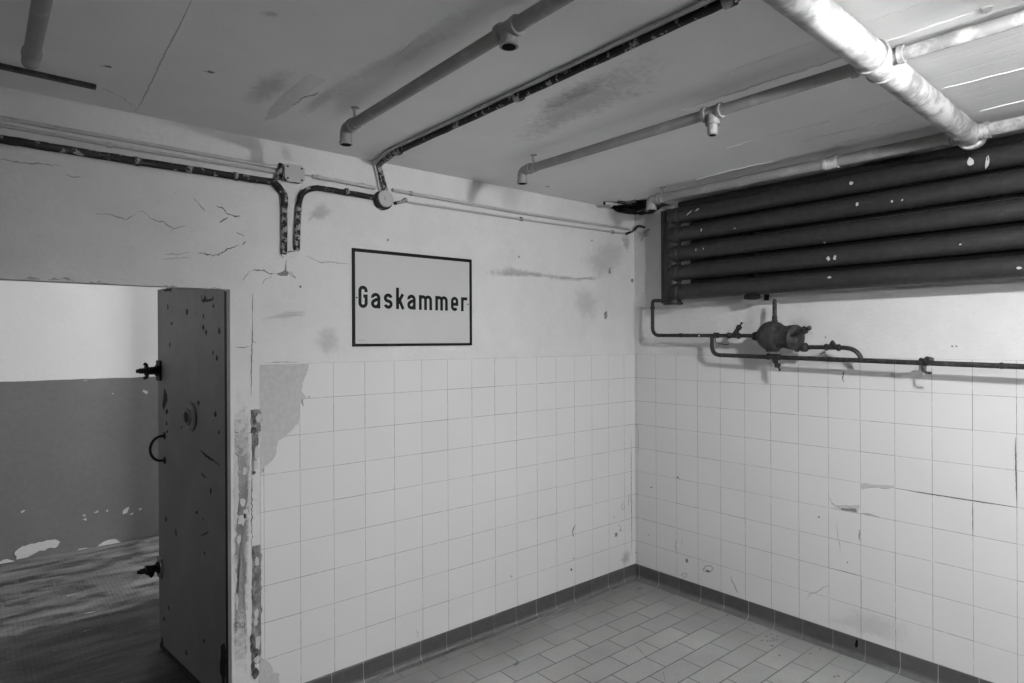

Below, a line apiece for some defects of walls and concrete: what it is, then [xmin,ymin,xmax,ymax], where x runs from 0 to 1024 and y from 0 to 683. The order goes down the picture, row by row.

crack [96,199,246,260]
crack [237,269,295,386]
peeling [0,539,60,564]
peeling [233,363,310,683]
crack [896,438,1017,531]